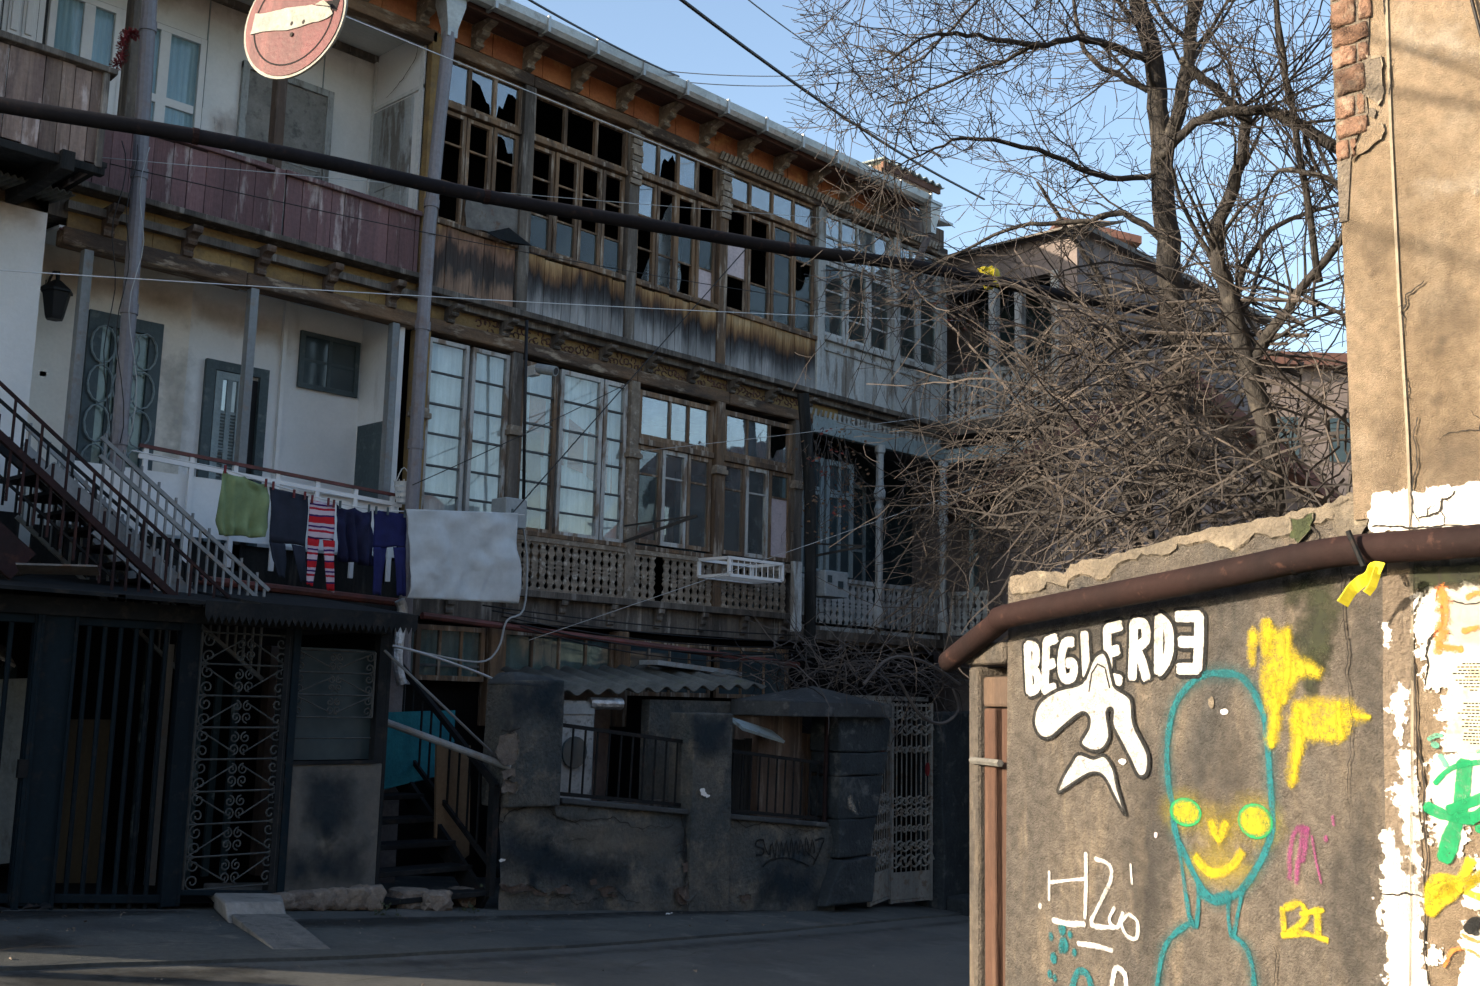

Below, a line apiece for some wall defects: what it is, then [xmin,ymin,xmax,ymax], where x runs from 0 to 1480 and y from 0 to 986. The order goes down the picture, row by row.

spalling [1289,512,1314,543]
peeling [1332,481,1480,536]
crack [1372,376,1480,530]
leakage [292,778,356,880]
peeling [1372,583,1480,986]
crack [1380,566,1480,983]